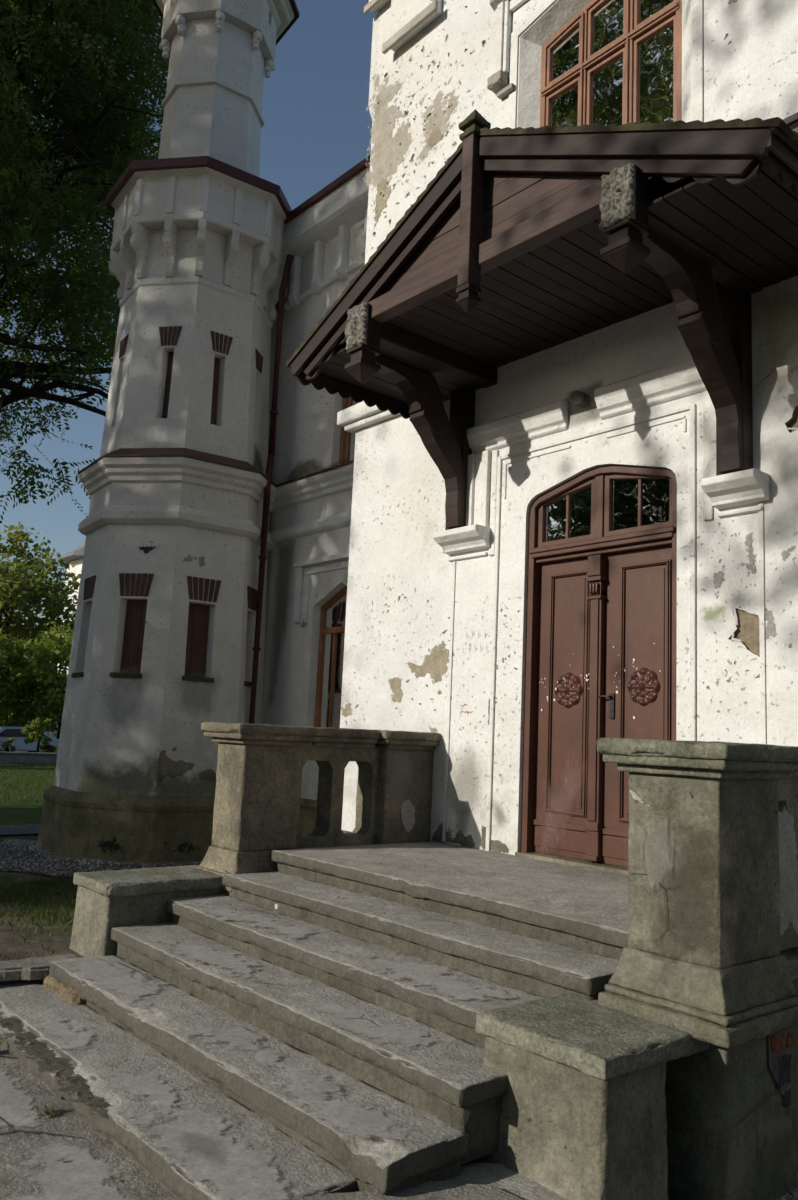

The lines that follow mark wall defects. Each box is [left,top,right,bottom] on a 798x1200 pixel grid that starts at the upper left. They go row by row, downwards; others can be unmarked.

peeling [363,29,486,237]
spalling [785,405,798,433]
peeling [704,557,724,589]
peeling [745,533,756,574]
spalling [713,606,777,657]
peeling [388,601,457,716]
peeling [156,747,215,788]
spalling [432,822,509,853]
peeling [0,1012,111,1118]
peeling [0,1070,41,1129]